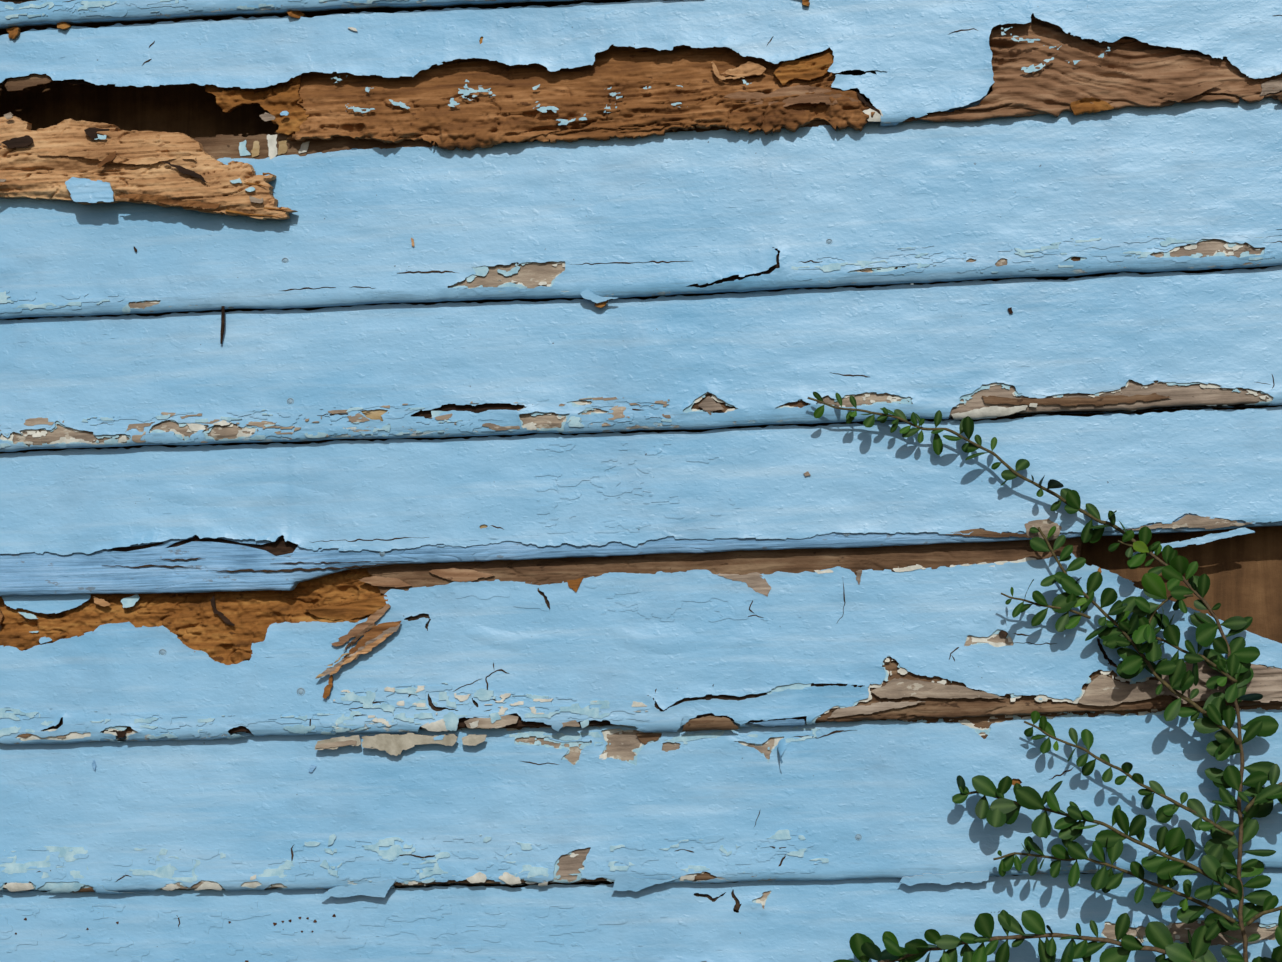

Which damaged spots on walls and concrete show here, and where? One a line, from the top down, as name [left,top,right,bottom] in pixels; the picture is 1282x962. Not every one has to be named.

peeling [1001,27,1080,73]
peeling [448,79,496,107]
peeling [532,84,587,125]
peeling [239,112,309,159]
peeling [448,261,565,292]
peeling [0,392,738,449]
peeling [948,379,1273,420]
crack [101,537,428,573]
peeling [1102,513,1282,556]
peeling [0,518,1081,644]
peeling [1107,589,1282,682]
peeling [0,682,819,765]